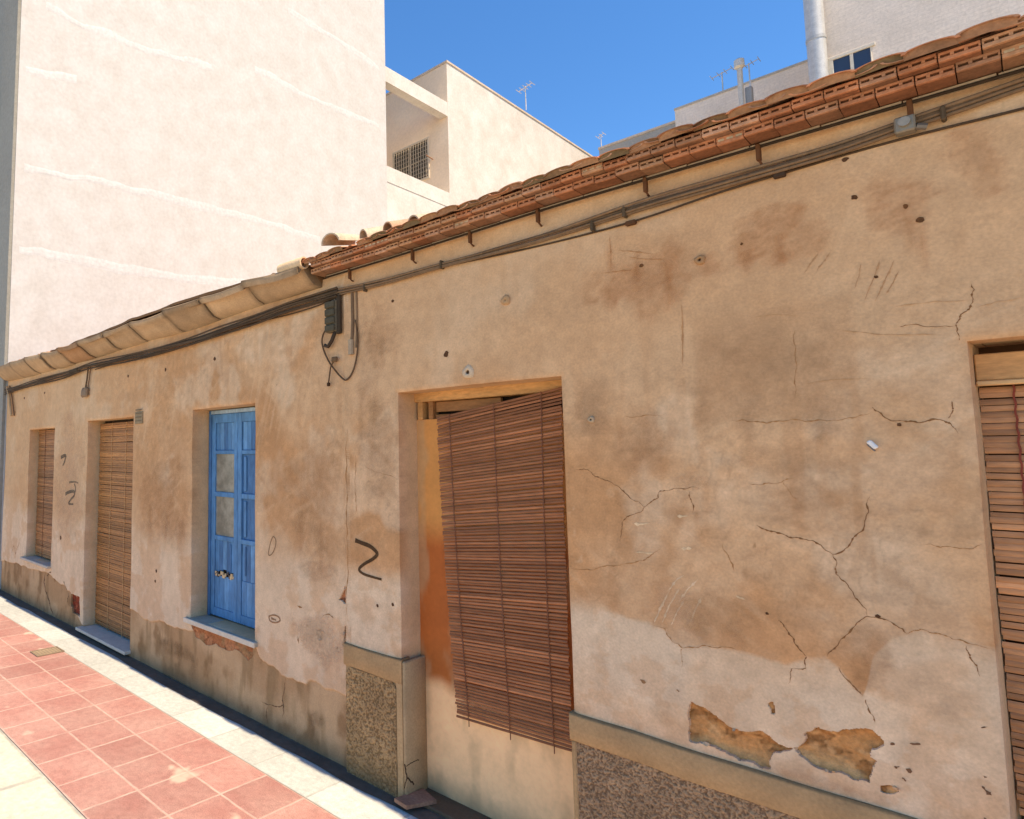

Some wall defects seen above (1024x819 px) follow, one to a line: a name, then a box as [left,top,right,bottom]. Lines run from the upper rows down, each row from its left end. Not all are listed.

crack [901,284,975,340]
crack [738,334,957,431]
flaking render [192,625,254,661]
crack [651,624,736,664]
crack [757,503,986,721]
flaking render [689,703,899,793]